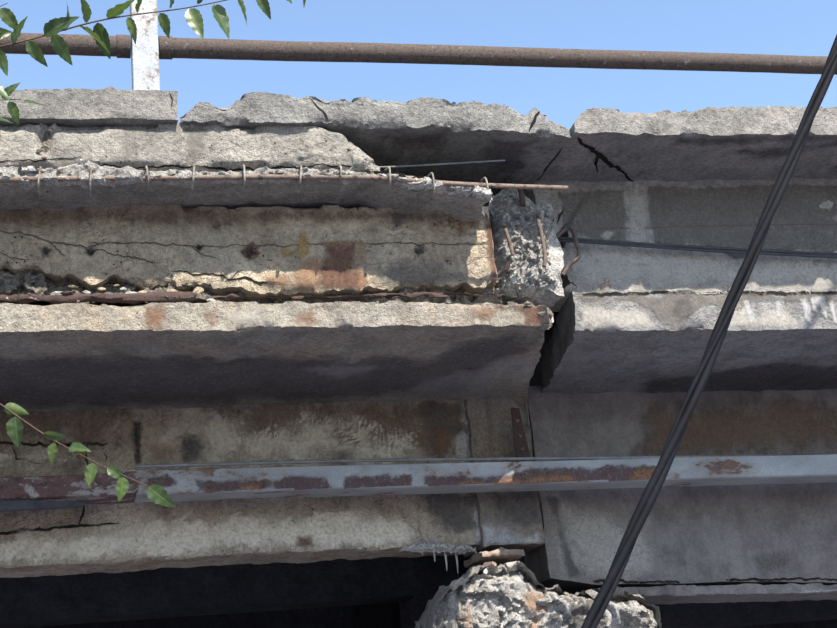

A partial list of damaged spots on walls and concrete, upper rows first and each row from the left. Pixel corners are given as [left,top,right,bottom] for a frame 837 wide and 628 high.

crack [578,138,634,182]
spalling [0,128,581,339]
water stain [648,185,774,258]
crack [0,230,324,285]
rust [0,236,504,328]
water stain [620,290,728,329]
water stain [730,293,837,326]
rust [196,476,330,492]
rust [424,464,656,486]
crack [0,506,118,535]
spalling [457,571,595,628]
spalling [600,600,653,628]